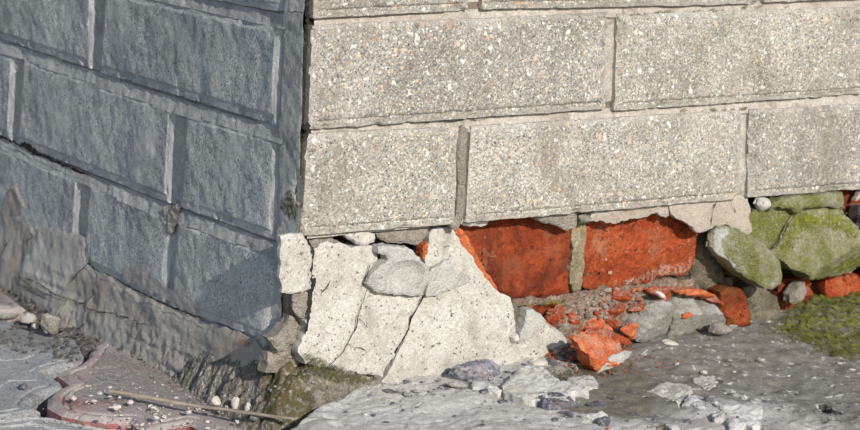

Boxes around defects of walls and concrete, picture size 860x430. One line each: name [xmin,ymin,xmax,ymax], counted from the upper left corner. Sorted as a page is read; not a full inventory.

crack [288,0,314,176]
peeling [530,195,752,234]
peeling [18,227,88,295]
crack [304,247,330,334]
crack [321,263,371,372]
crack [386,293,425,367]